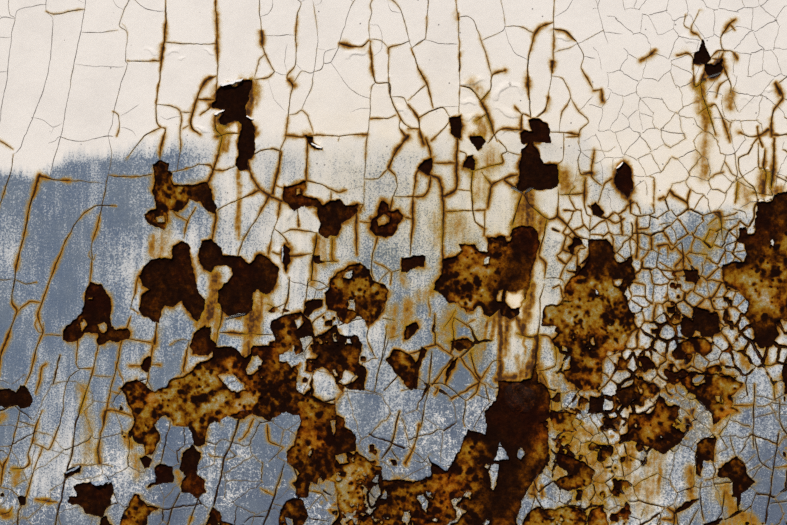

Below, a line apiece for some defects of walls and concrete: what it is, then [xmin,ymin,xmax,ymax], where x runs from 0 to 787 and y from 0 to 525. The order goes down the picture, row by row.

corrosion [246,79,260,117]
crack [0,0,688,394]
peeling [281,179,407,239]
peeling [511,117,560,193]
corrosion [694,83,710,180]
crack [676,11,787,262]
crack [0,277,191,525]
corrosion [241,294,290,357]
peeling [118,191,787,525]
corrosion [472,266,787,525]
peeling [64,465,159,525]
crack [167,417,285,525]